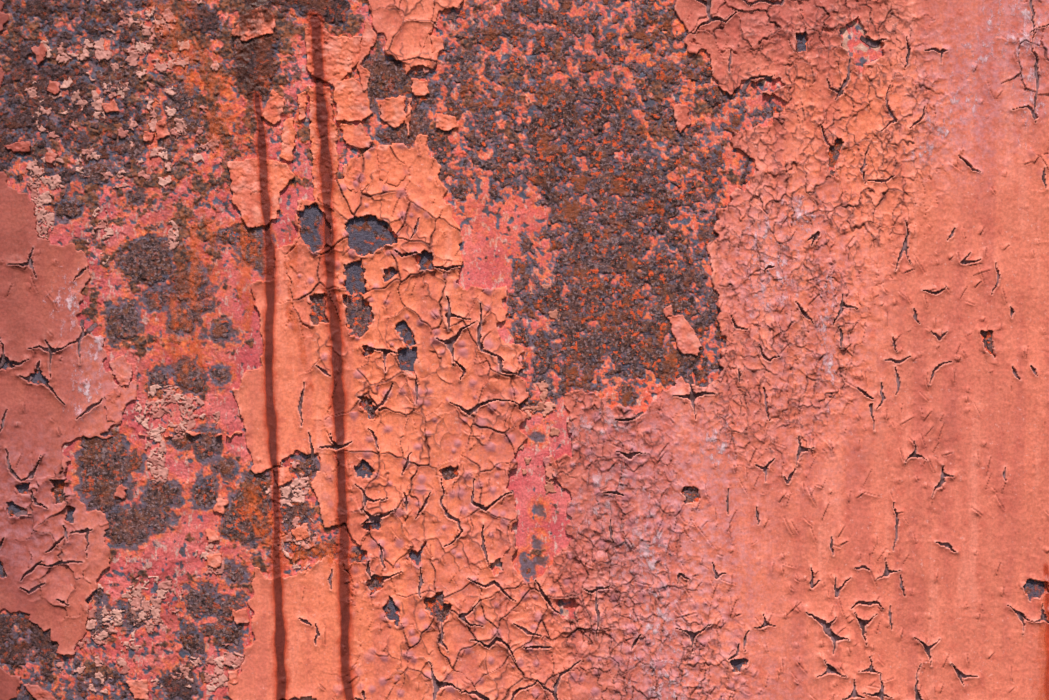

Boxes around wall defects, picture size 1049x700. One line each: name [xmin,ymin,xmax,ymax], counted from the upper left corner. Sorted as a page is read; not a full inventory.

corrosion [0,0,171,221]
corrosion [362,0,783,413]
peeling [839,17,884,78]
corrosion [77,432,181,547]
corrosion [149,0,363,700]
crack [298,346,418,464]
peeling [0,0,786,700]
crack [355,453,580,700]
crack [436,296,527,415]
crack [808,502,977,700]
peeling [980,330,995,358]
peeling [1023,579,1045,601]